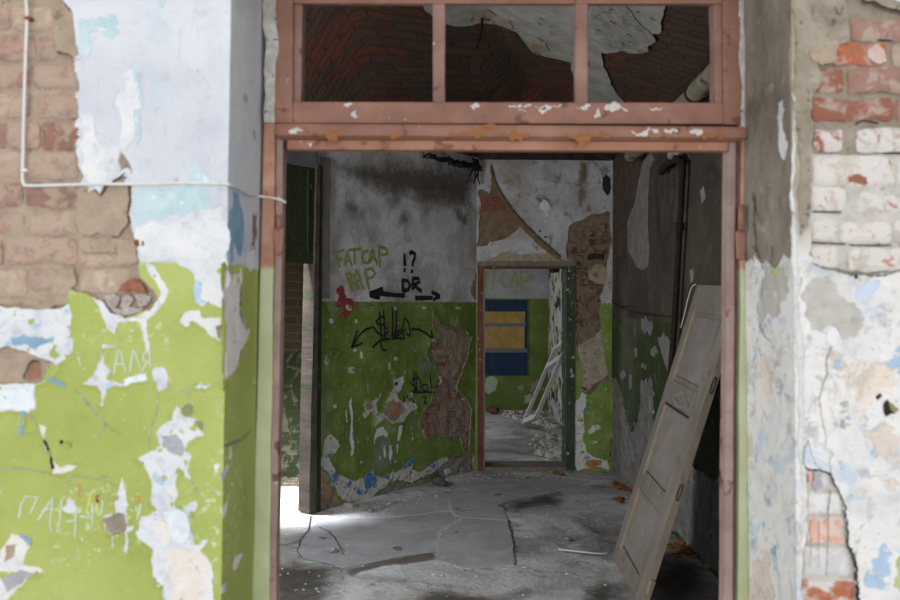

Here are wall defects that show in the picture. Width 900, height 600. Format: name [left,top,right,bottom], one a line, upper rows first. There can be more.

flaking render [0,0,175,479]
peeling [98,257,251,600]
crack [282,516,345,572]
flaking render [321,306,475,511]
crack [365,496,526,569]
flaking render [477,156,676,491]
flaking render [671,463,720,579]
flaking render [801,469,857,600]
flaking render [801,0,900,340]